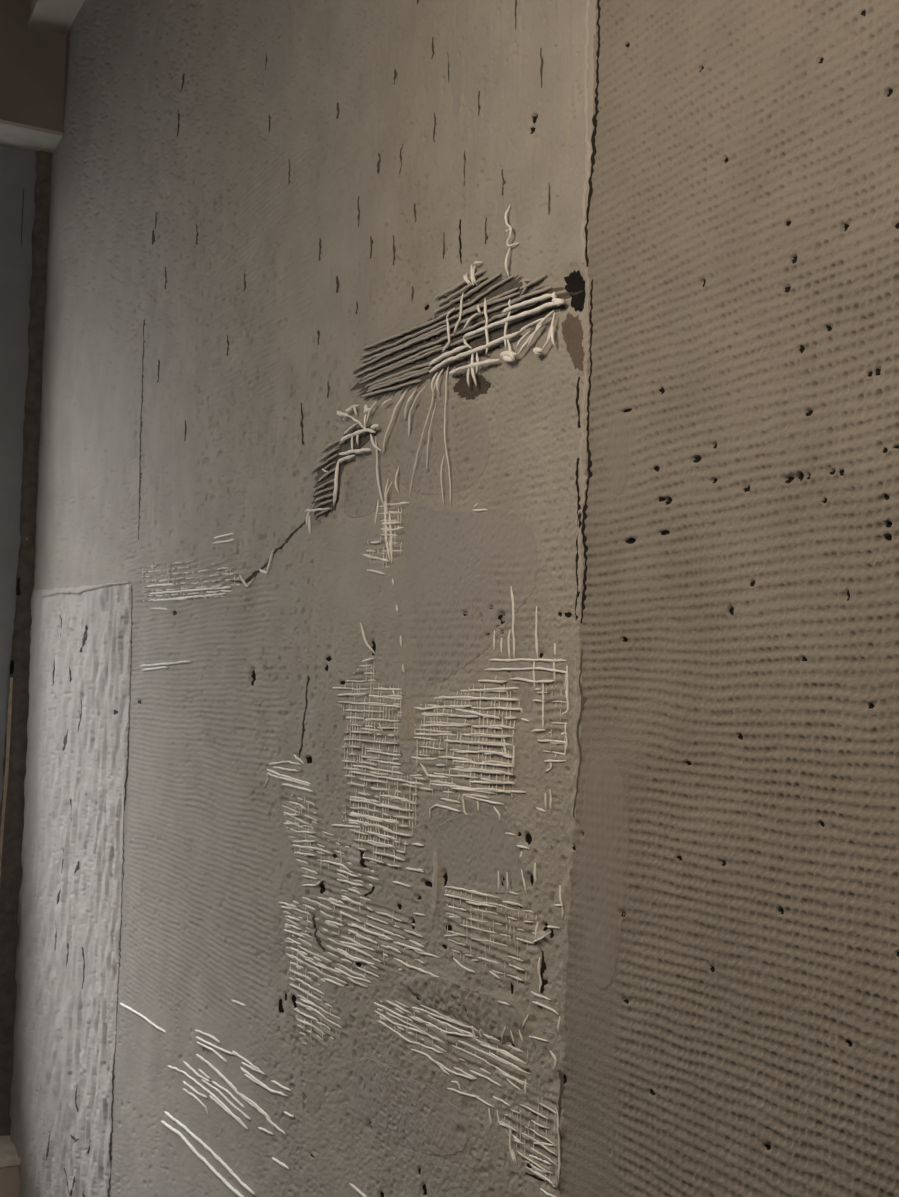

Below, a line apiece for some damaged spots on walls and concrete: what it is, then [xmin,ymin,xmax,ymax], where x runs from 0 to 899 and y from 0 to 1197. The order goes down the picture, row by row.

spalling [564,270,586,312]
crack [298,403,306,445]
crack [573,0,601,817]
crack [231,520,305,583]
spalling [417,812,534,912]
spalling [278,993,297,1013]
spalling [406,975,524,1047]